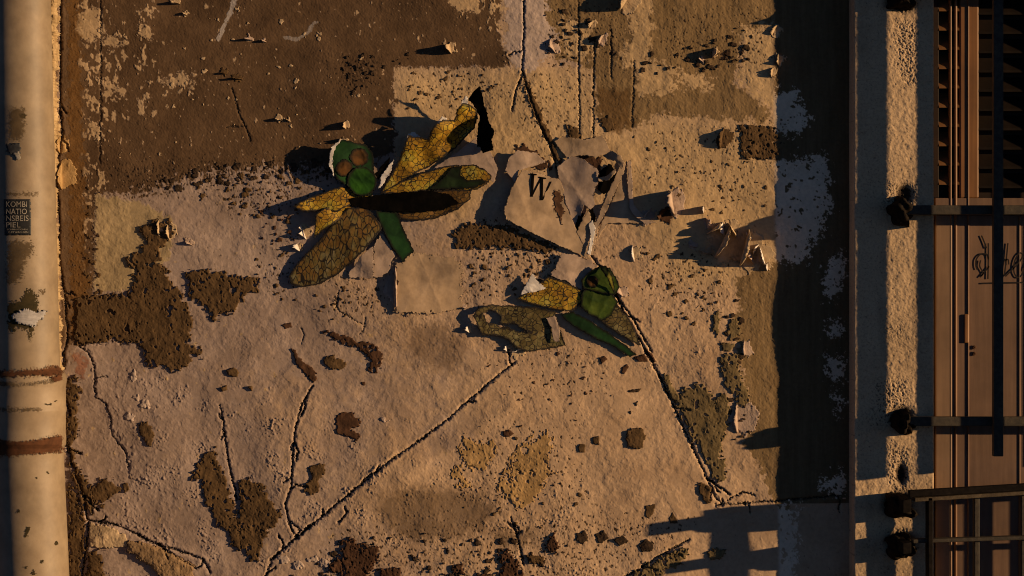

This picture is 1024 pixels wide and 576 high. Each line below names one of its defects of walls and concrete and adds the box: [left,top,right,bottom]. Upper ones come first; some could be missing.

crack [508,0,528,110]
peeling [56,135,101,216]
spalling [638,124,779,226]
spalling [72,157,333,373]
corrosion [0,435,64,458]
corrosion [0,354,88,387]
crack [66,441,210,576]
crack [219,405,237,501]
spalling [190,446,282,562]
crack [265,351,515,576]
spalling [662,181,776,504]
crack [614,294,841,513]